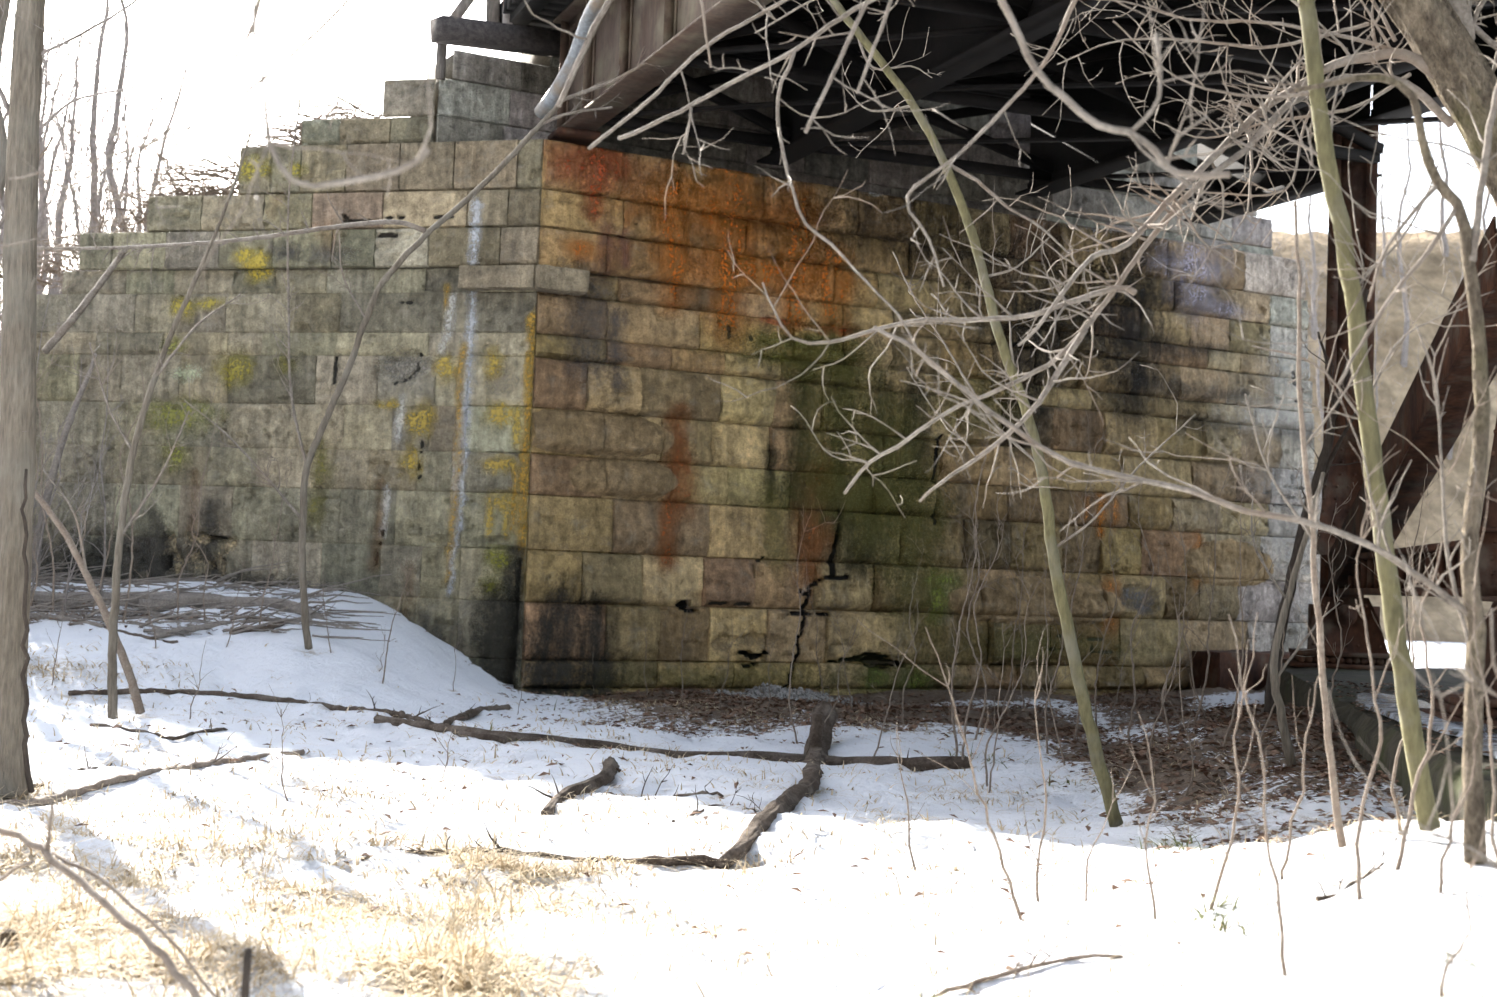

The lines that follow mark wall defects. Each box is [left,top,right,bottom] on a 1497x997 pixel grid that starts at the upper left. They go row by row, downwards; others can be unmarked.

efflorescence [471,200,480,265]
corrosion [550,144,637,277]
corrosion [633,166,853,337]
efflorescence [441,292,476,591]
corrosion [657,408,694,569]
water stain [755,334,995,628]
crack [708,599,750,607]
crack [781,512,849,689]